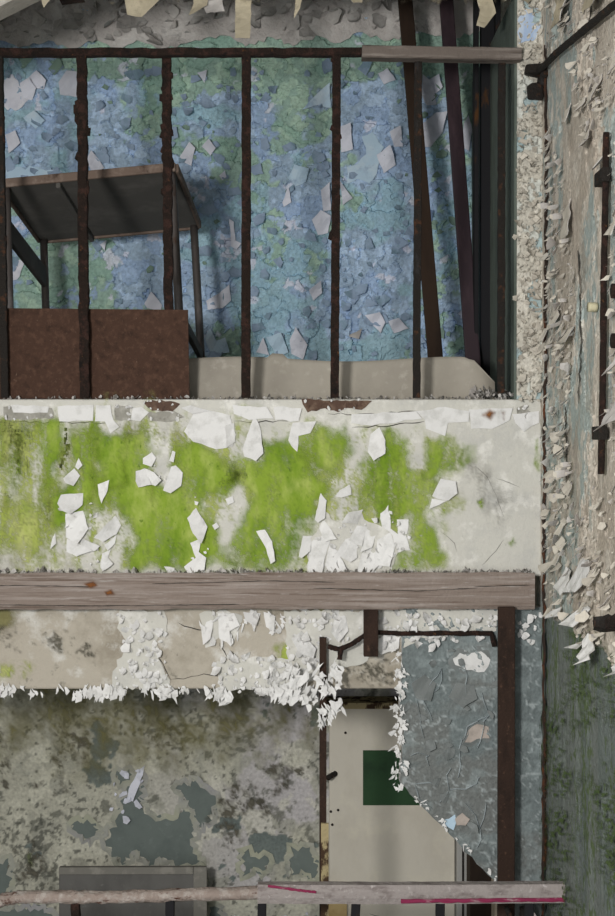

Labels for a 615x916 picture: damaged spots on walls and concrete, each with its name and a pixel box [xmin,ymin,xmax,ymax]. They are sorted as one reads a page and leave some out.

peeling [0,0,401,48]
peeling [413,0,442,36]
peeling [453,0,496,38]
peeling [3,58,615,677]
peeling [0,683,43,700]
leakage [37,689,204,766]
peeling [56,609,369,730]
leakage [207,689,252,735]
peeling [378,609,498,792]
leakage [266,765,302,795]
leakage [218,785,269,844]
leakage [18,840,52,880]